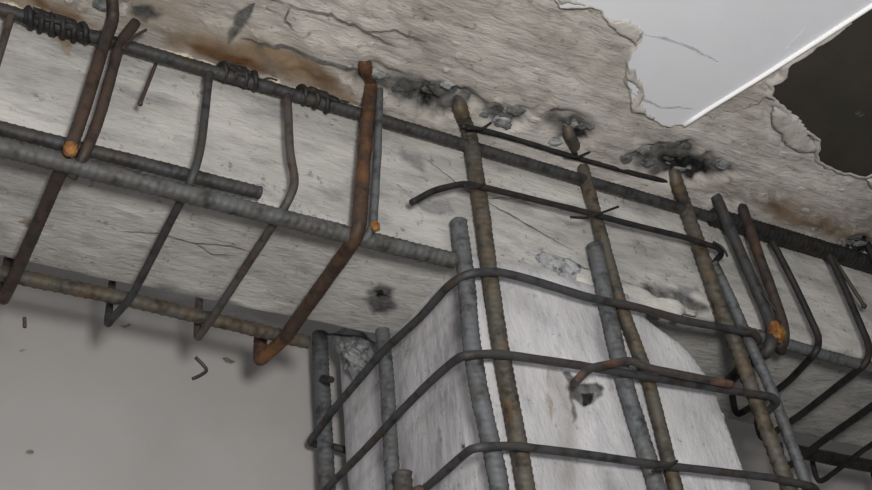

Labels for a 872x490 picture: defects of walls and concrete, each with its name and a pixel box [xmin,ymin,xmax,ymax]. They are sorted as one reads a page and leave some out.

spalling [0,0,107,44]
rust [172,37,350,99]
spalling [0,121,351,243]
spalling [110,0,872,317]
spalling [18,270,282,341]
spalling [288,327,413,490]
spalling [458,276,536,490]
spalling [563,372,603,420]
spalling [598,304,650,364]
spalling [614,365,684,490]
spalling [690,242,872,483]